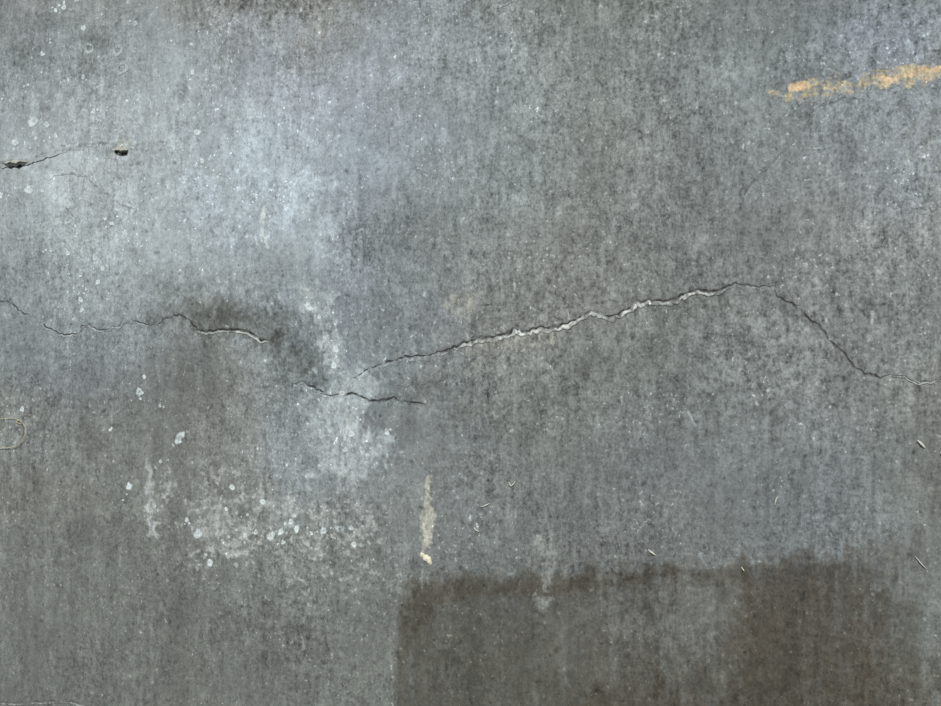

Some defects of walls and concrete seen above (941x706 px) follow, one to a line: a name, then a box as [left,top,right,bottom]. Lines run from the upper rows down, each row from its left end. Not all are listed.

peeling [786,77,812,93]
peeling [875,60,941,88]
crack [0,141,135,209]
crack [0,300,269,343]
crack [293,282,941,404]
leakage [117,261,941,706]